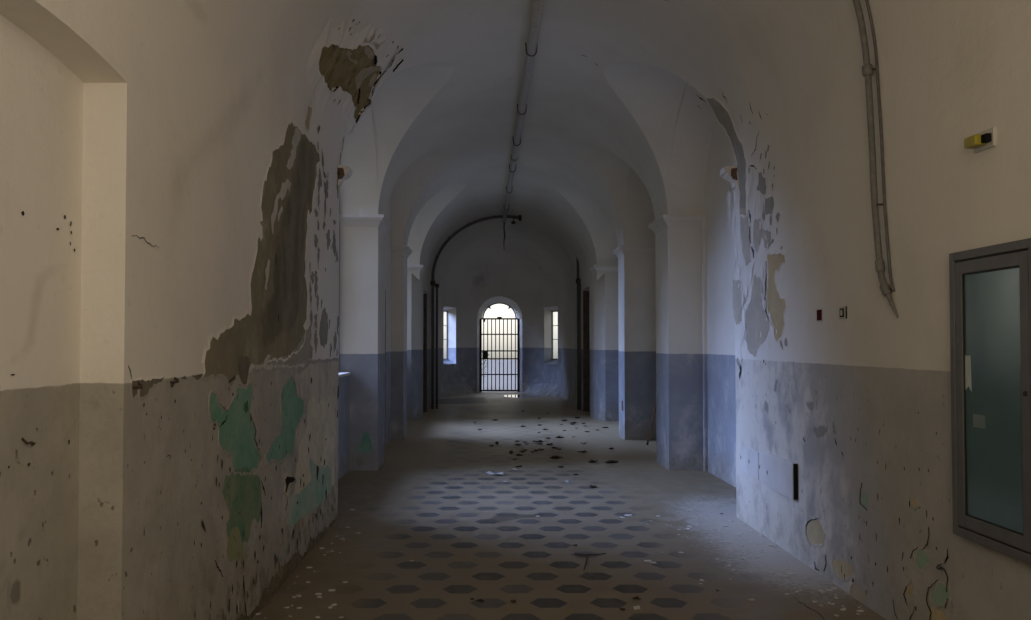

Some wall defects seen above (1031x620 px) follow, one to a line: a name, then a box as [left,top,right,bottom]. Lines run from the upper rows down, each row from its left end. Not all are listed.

peeling [181,17,403,620]
peeling [696,94,788,369]
flaking render [805,514,855,583]